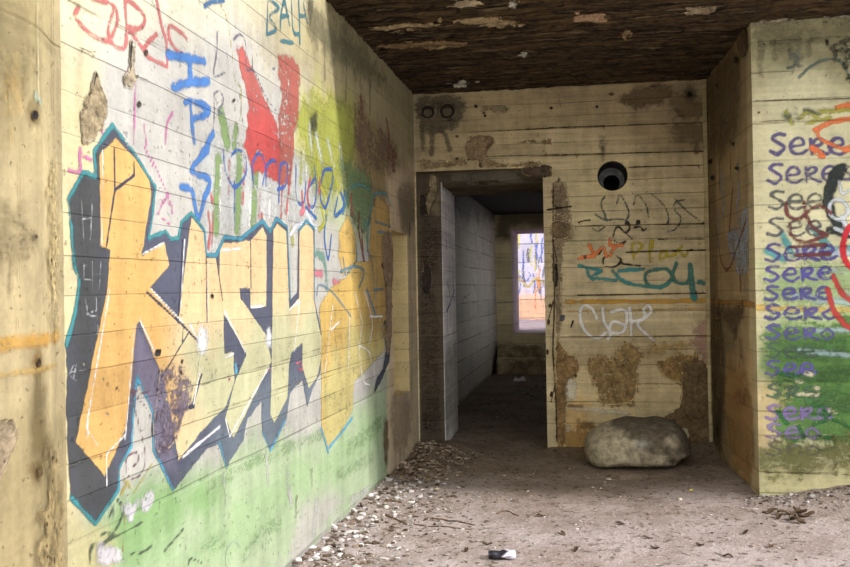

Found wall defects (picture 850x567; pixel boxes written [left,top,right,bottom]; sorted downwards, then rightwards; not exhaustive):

peeling [368,0,525,51]
peeling [572,12,608,23]
spalling [124,40,148,88]
spalling [80,71,108,144]
damp [416,95,465,156]
damp [619,49,738,160]
peeling [418,135,642,447]
spalling [657,353,709,447]
spalling [0,419,19,480]